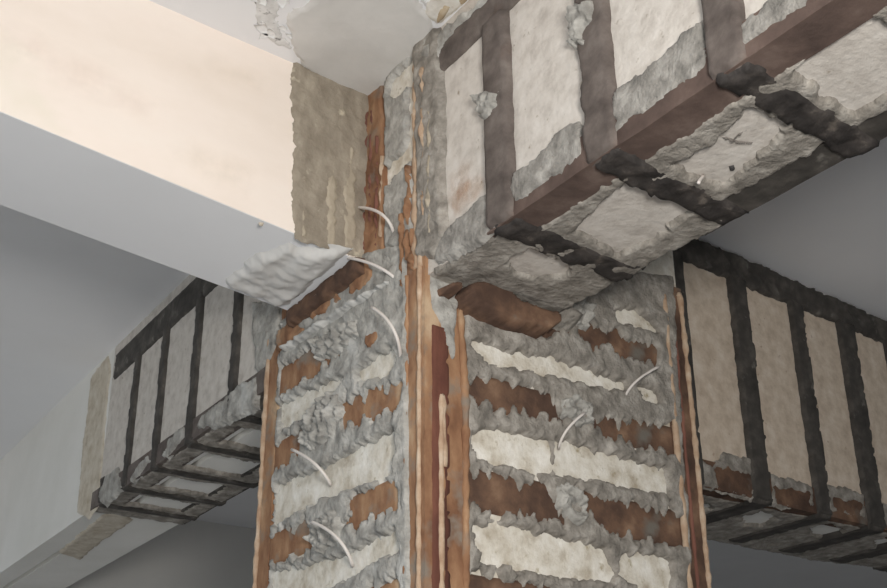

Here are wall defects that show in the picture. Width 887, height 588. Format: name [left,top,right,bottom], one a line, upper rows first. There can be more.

spalling [59,275,263,560]
spalling [683,262,747,462]
spalling [746,287,812,487]
spalling [804,311,862,494]
spalling [855,332,887,504]